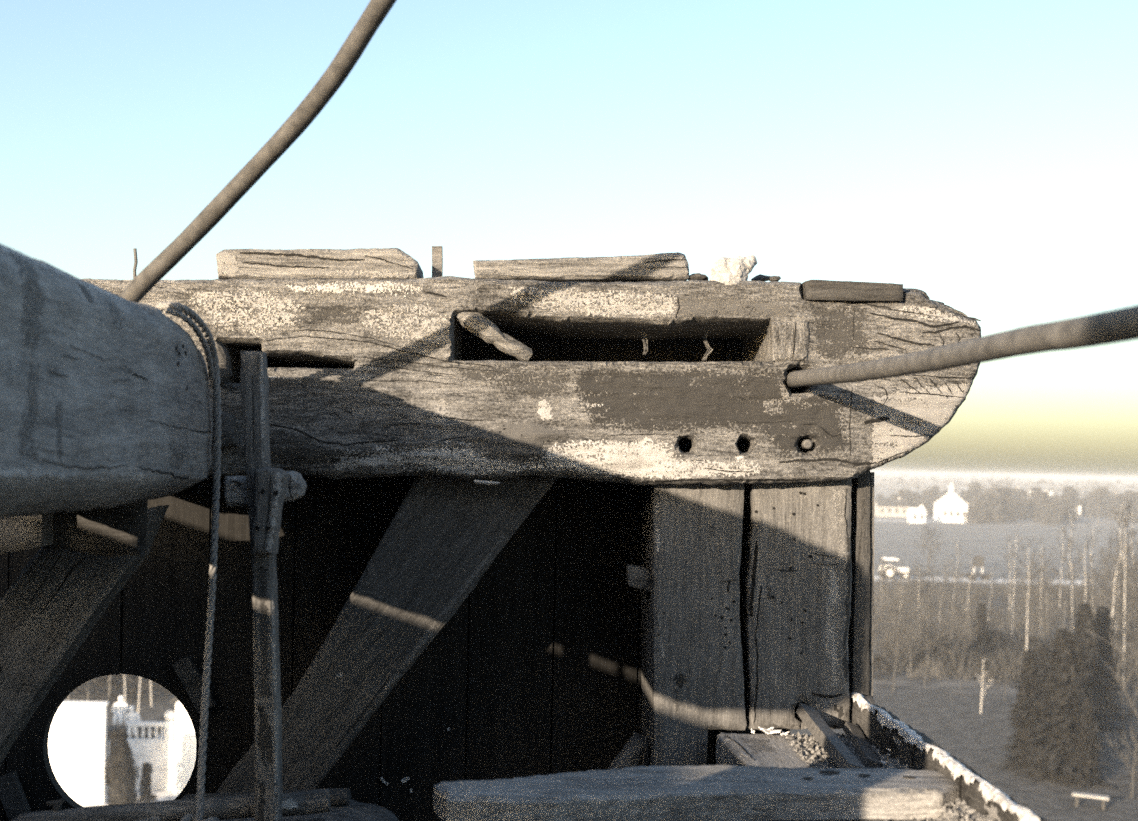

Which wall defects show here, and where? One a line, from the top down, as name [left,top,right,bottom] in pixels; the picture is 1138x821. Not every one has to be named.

crack [637,303,980,760]